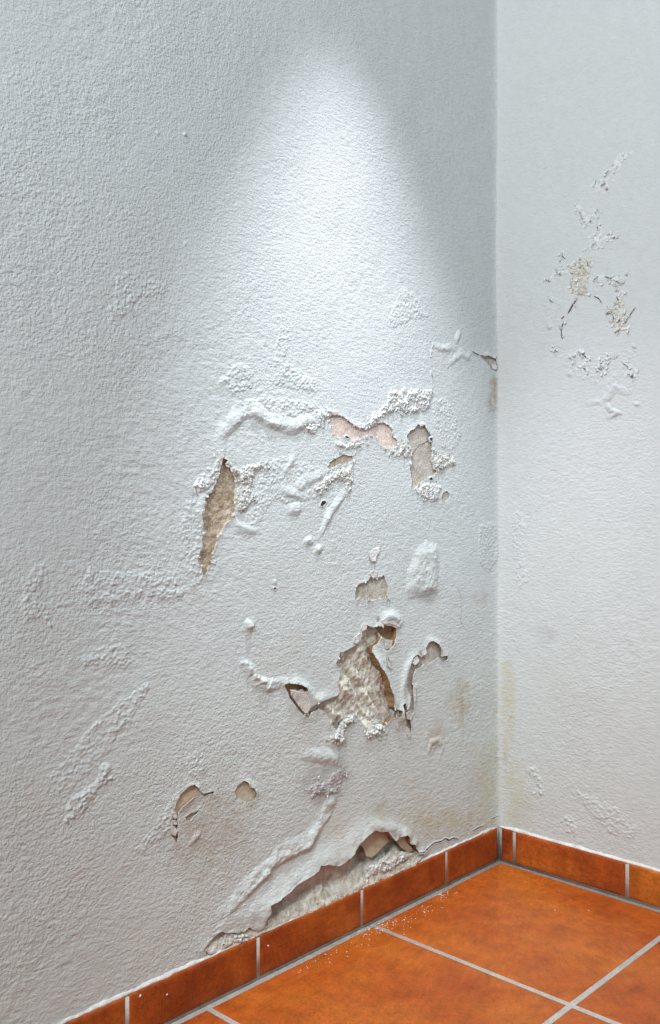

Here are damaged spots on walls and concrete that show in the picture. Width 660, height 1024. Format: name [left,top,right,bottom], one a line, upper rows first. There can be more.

peeling [542,223,630,335]
peeling [304,388,456,508]
spalling [193,450,276,575]
spalling [355,548,390,601]
spalling [285,615,448,745]
spalling [170,785,214,843]
spalling [235,781,257,802]
spalling [204,831,424,955]